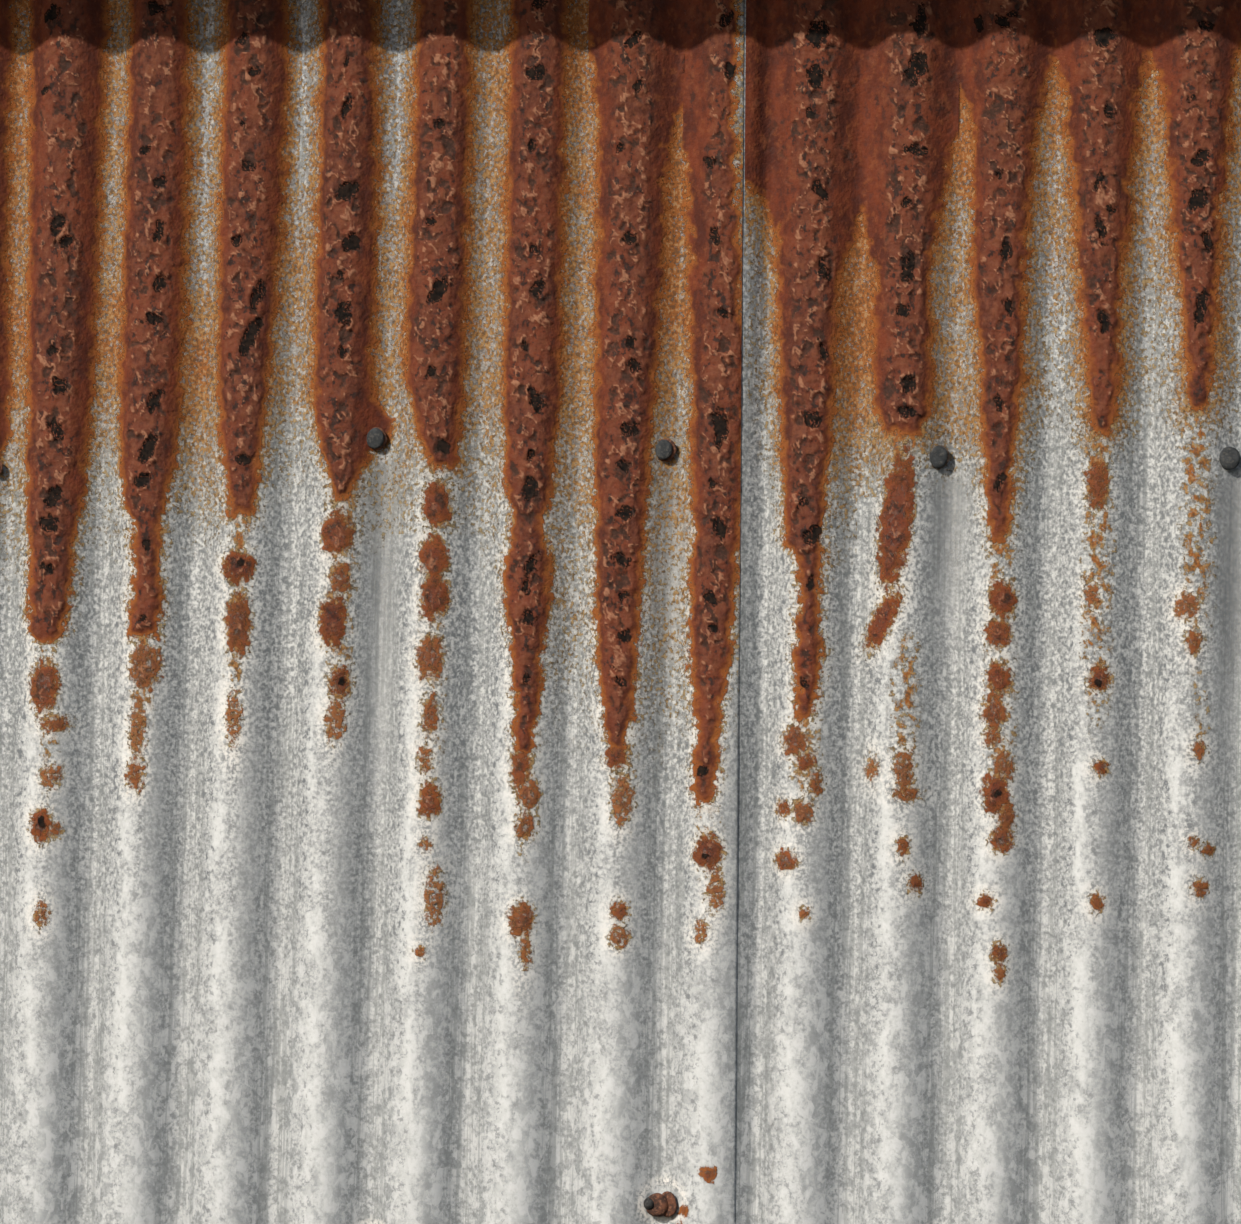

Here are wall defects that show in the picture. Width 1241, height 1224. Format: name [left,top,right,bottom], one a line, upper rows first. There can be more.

corrosion [0,0,1241,952]
corrosion [505,897,538,971]
corrosion [989,940,1010,987]
corrosion [698,1166,717,1184]